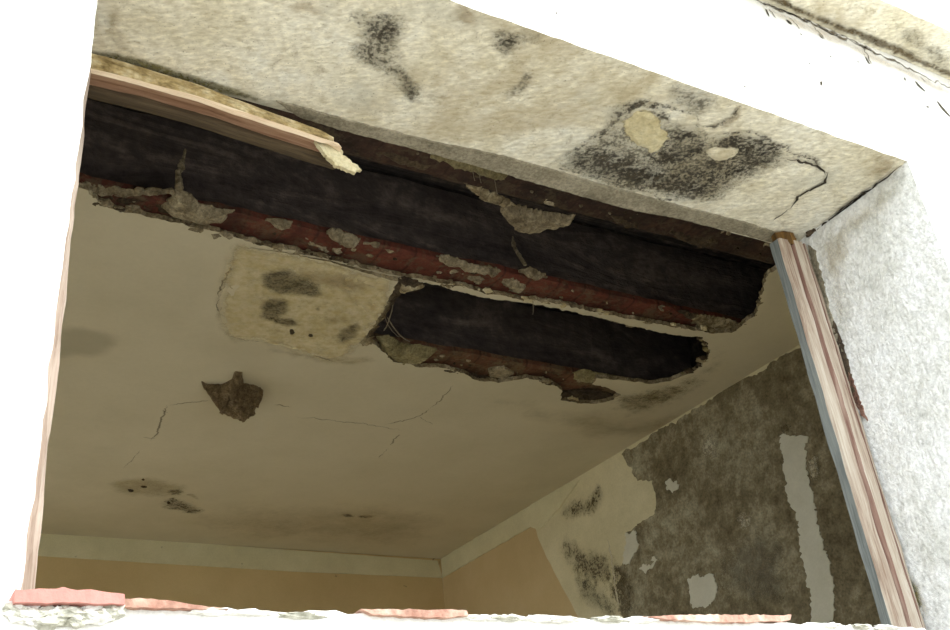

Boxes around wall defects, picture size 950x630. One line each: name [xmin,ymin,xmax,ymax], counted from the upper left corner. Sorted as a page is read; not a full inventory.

damp [357,15,419,100]
peeling [82,181,236,240]
peeling [305,227,380,255]
peeling [276,100,826,249]
damp [567,88,827,201]
crack [774,159,828,220]
damp [263,271,318,335]
peeling [436,254,578,308]
damp [563,487,600,516]
flaking render [463,348,901,630]
damp [563,543,633,614]
spalling [186,607,328,620]